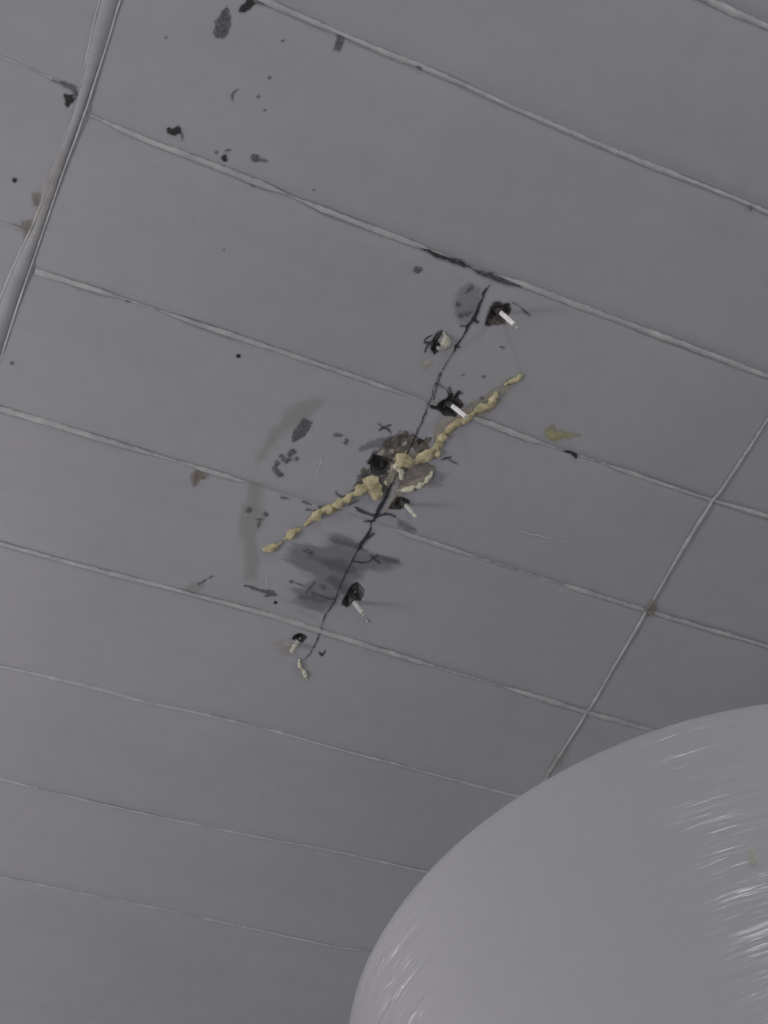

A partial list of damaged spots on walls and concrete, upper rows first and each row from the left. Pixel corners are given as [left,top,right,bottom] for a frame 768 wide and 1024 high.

crack [306,248,530,658]